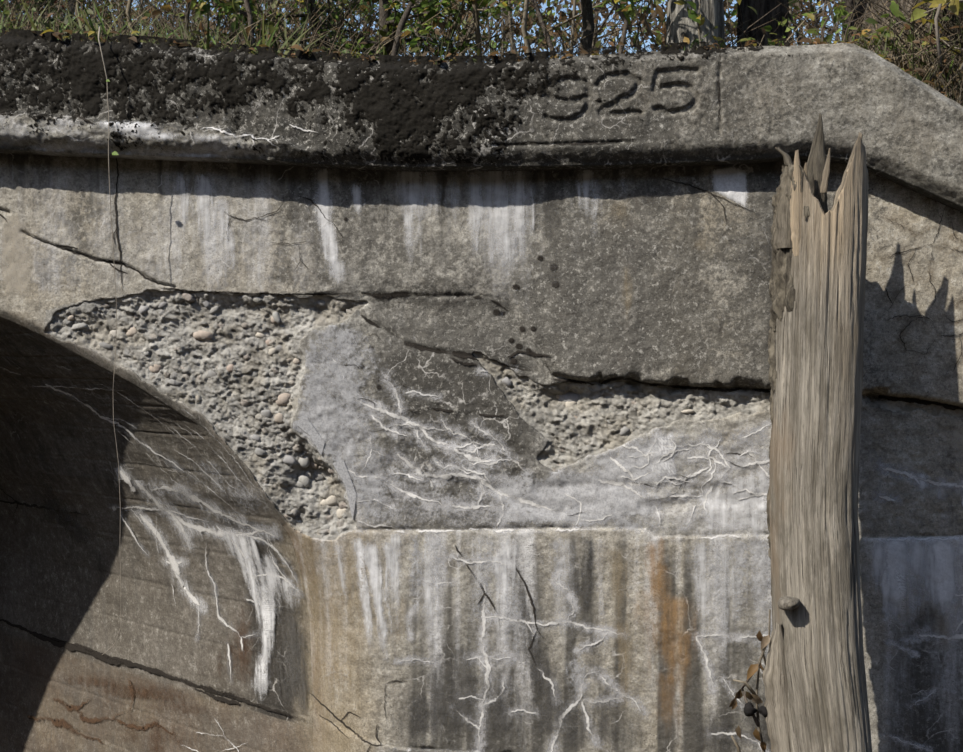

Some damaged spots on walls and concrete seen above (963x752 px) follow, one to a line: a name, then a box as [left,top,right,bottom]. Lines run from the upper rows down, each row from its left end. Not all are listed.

spalling [46,290,386,540]
crack [0,158,448,337]
crack [404,342,771,393]
spalling [473,326,771,471]
crack [662,178,750,220]
spalling [870,400,963,419]
crack [885,206,963,372]
crack [0,368,299,752]
leakage [225,531,306,707]
crack [303,353,772,752]
leakage [354,428,771,752]
leakage [873,540,963,622]